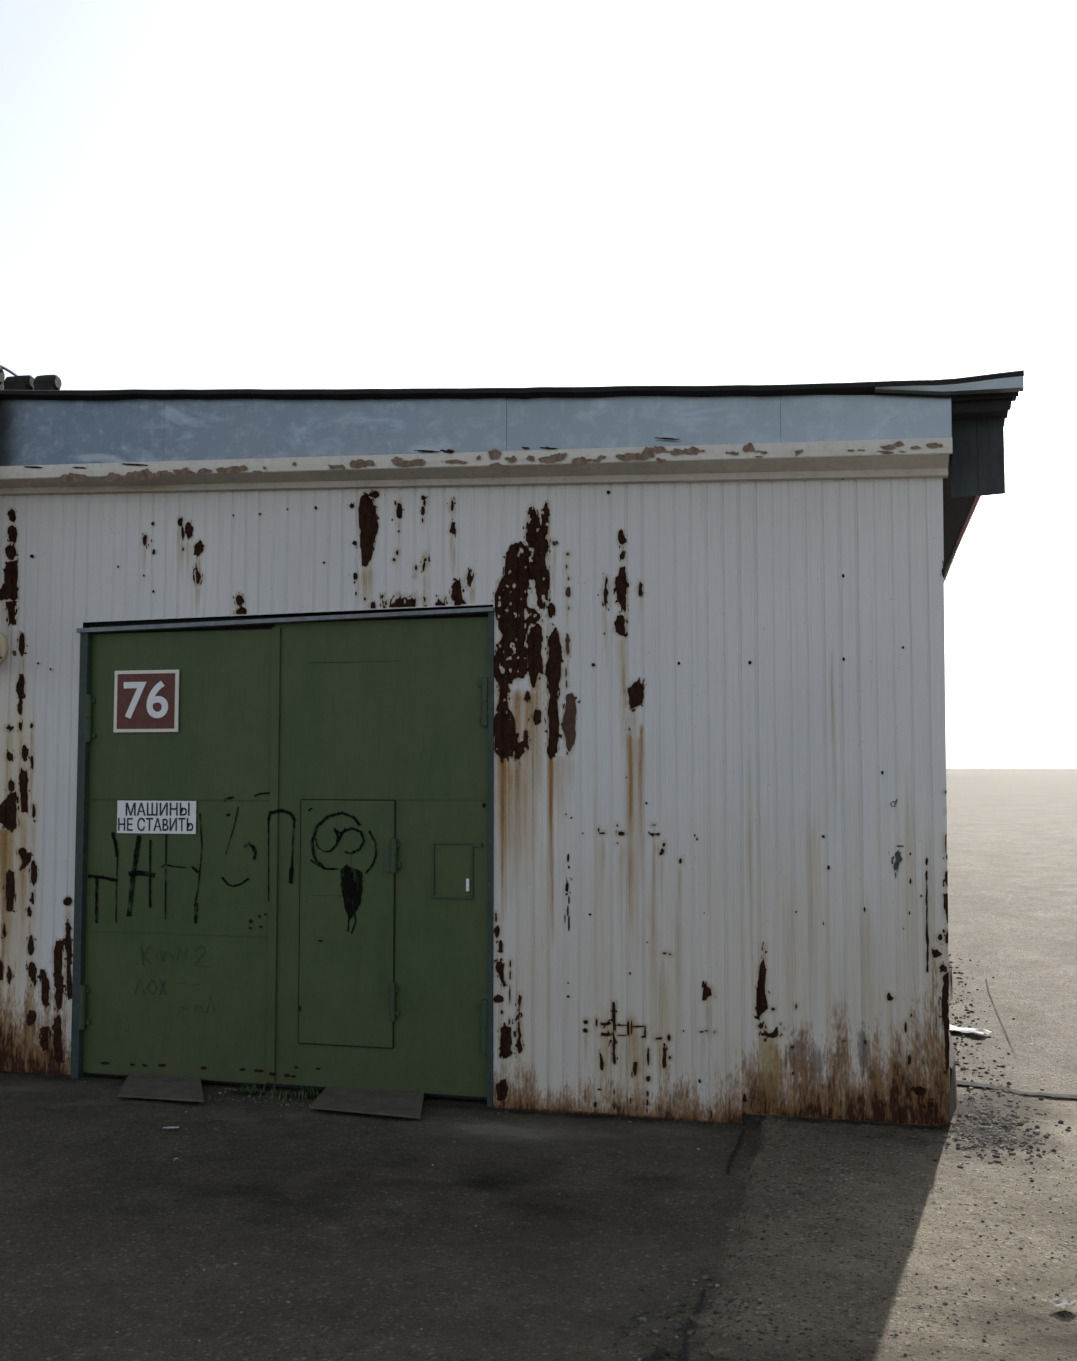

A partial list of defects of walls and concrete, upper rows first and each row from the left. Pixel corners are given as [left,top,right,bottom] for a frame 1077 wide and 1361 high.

peeling [55,465,266,483]
peeling [328,459,375,470]
peeling [391,446,705,470]
peeling [725,443,767,458]
peeling [847,441,943,454]
rust [0,508,52,670]
rust [347,490,475,608]
rust [482,500,580,931]
rust [0,674,39,939]
rust [0,897,73,1075]
rust [493,835,951,1127]
crack [641,1287,706,1361]